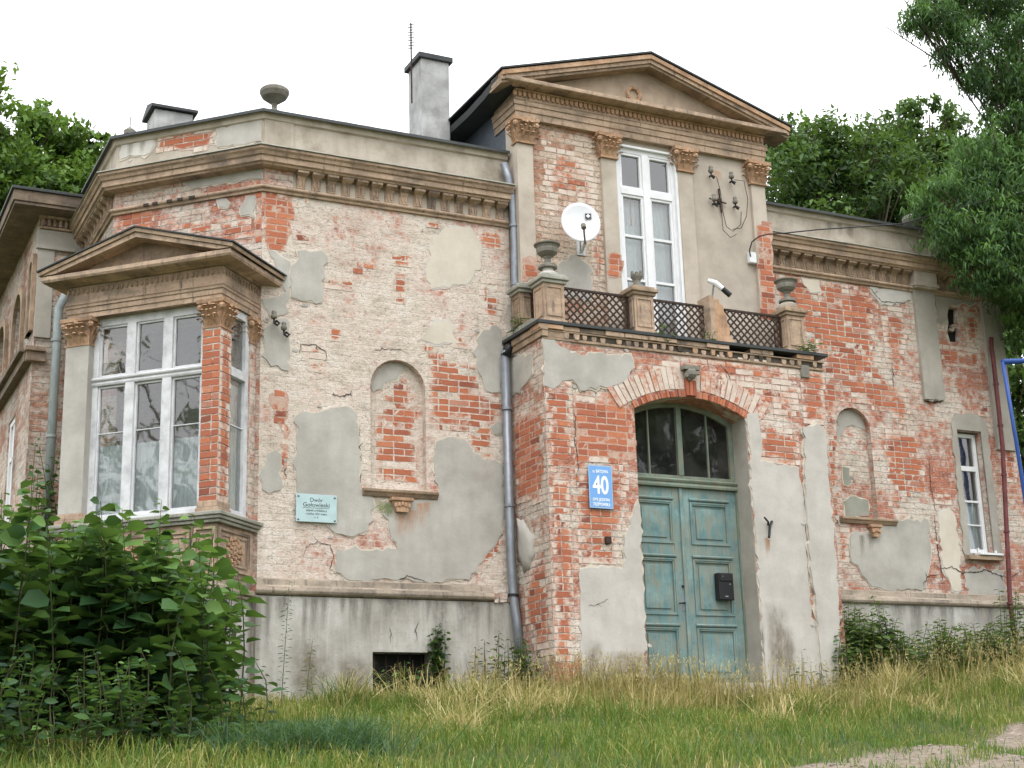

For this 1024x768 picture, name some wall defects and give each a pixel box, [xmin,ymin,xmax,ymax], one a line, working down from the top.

flaking render [156,130,216,154]
flaking render [119,192,312,253]
flaking render [522,256,538,282]
flaking render [541,140,600,228]
flaking render [591,230,624,284]
flaking render [374,369,420,484]
flaking render [421,274,503,460]
flaking render [648,221,952,568]
flaking render [939,307,981,369]
flaking render [513,381,637,662]